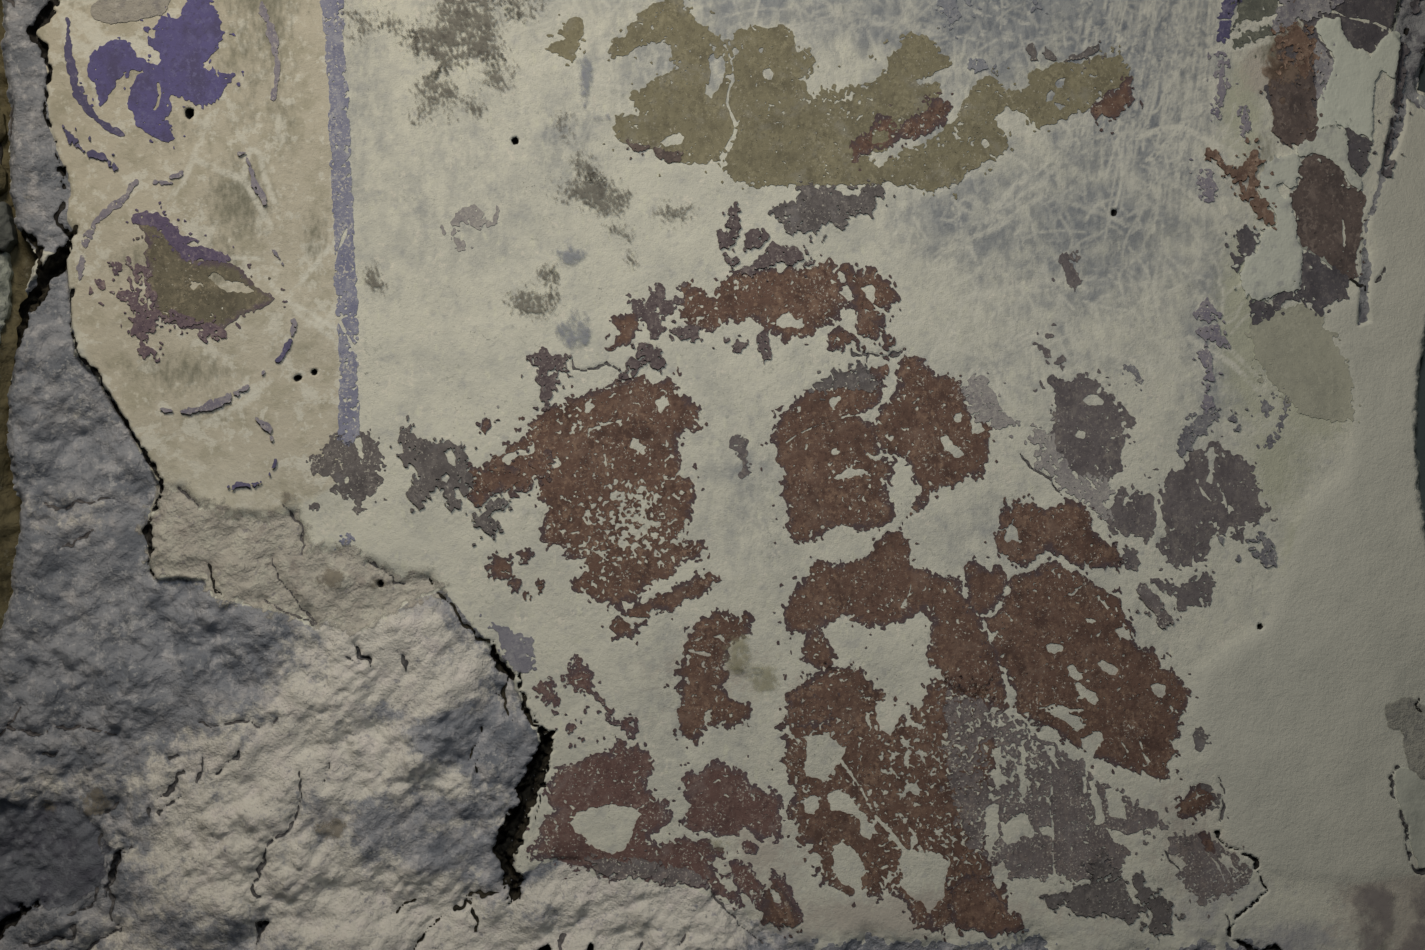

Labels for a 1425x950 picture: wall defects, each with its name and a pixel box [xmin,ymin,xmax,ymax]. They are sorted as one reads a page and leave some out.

crack [0,0,199,576]
peeling [396,0,1143,645]
peeling [1204,0,1425,449]
crack [0,707,117,757]
crack [0,717,278,950]
crack [208,563,222,595]
crack [250,762,330,945]
crack [264,504,317,626]
crack [346,644,409,671]
crack [368,560,555,950]
spalling [0,270,1277,950]
spalling [1385,697,1425,869]